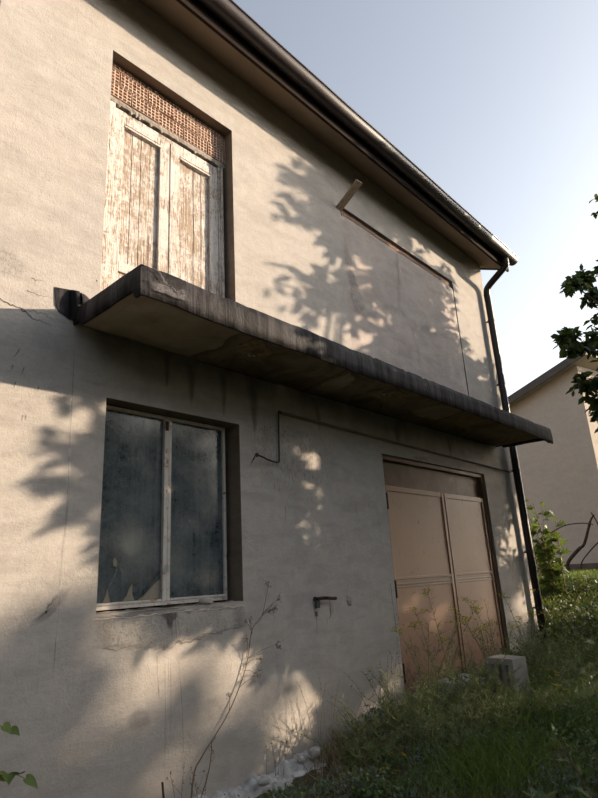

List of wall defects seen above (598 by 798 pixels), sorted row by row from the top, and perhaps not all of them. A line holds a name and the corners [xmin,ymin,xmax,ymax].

crack [0,278,68,326]